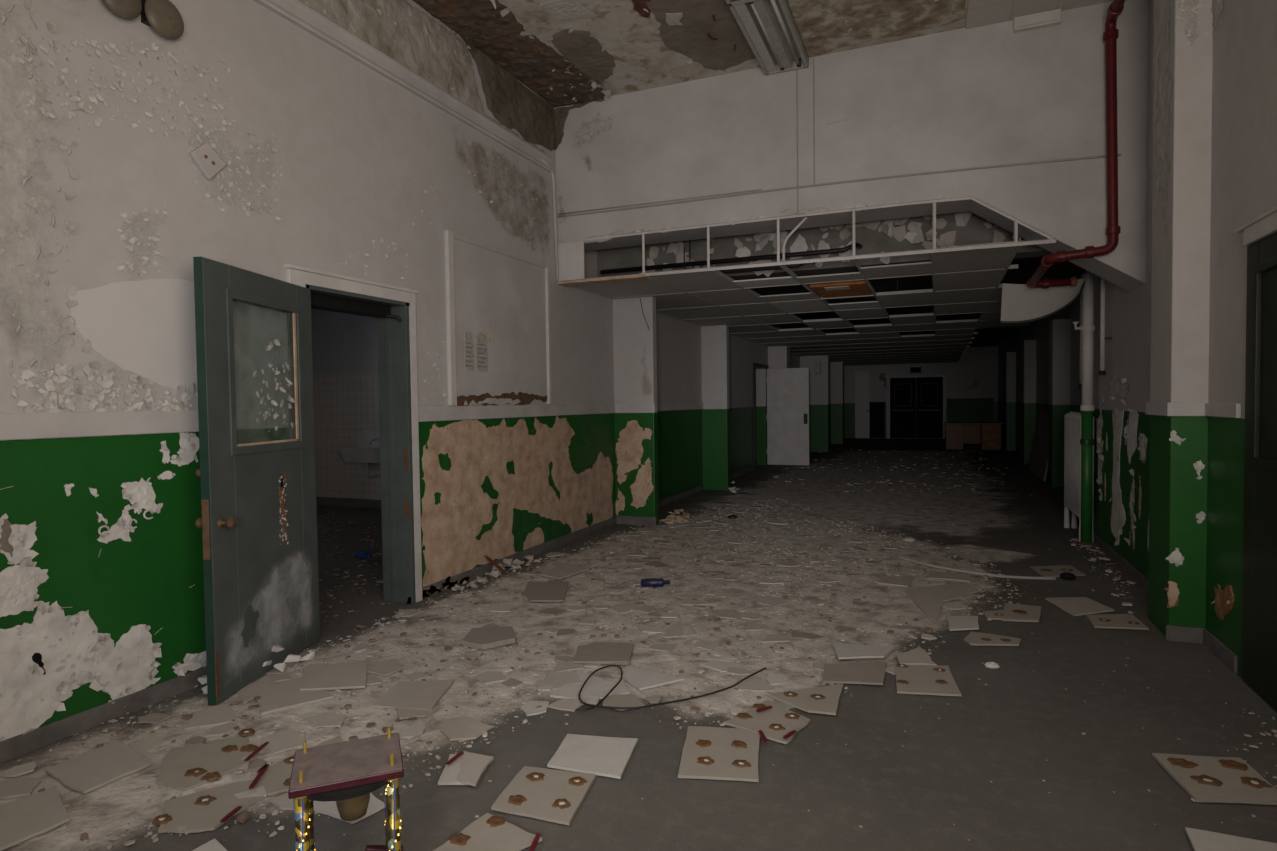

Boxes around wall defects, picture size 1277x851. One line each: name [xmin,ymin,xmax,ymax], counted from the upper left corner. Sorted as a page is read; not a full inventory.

flaking render [300,0,616,153]
flaking render [643,0,756,72]
peeling [787,0,966,57]
peeling [726,202,972,277]
peeling [253,339,295,431]
peeling [89,432,199,544]
peeling [421,415,654,590]
peeling [1096,402,1149,551]
peeling [1169,430,1186,445]
peeling [1193,460,1205,479]
peeling [1166,547,1184,567]
peeling [0,513,207,742]